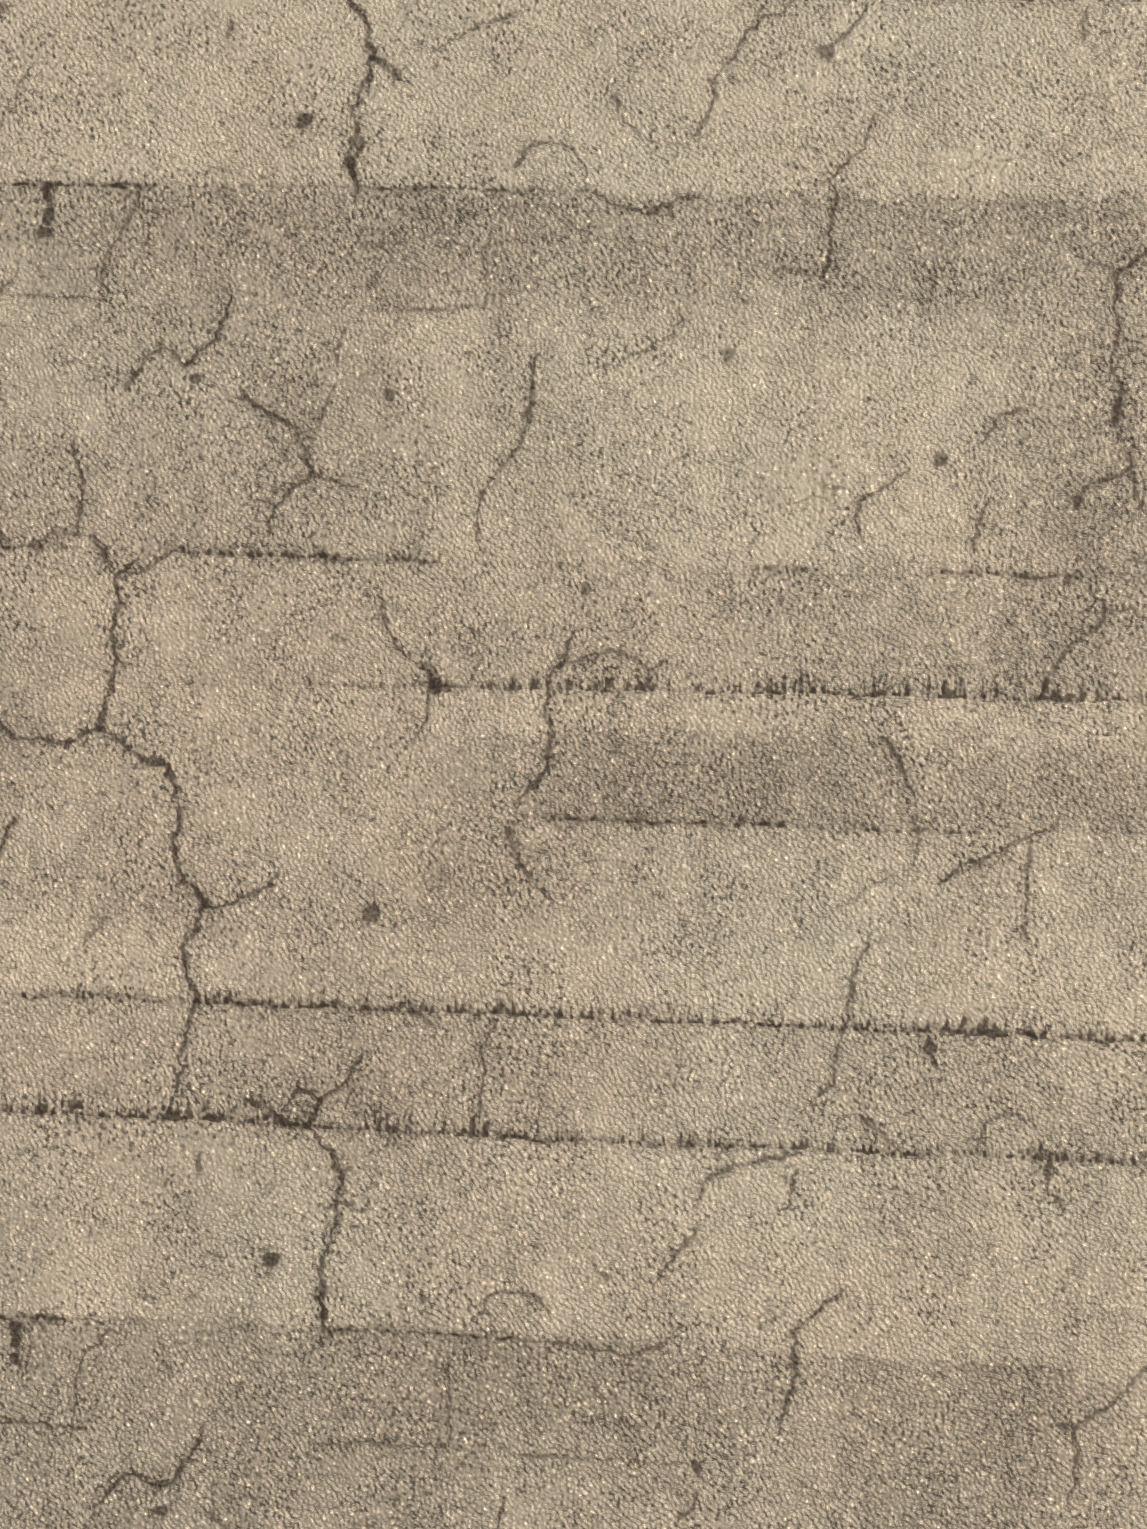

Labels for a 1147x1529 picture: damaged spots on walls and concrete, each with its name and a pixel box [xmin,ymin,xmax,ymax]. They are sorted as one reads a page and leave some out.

crack [339,0,525,206]
crack [117,287,234,395]
crack [235,326,360,540]
crack [1076,246,1147,516]
crack [1036,582,1147,703]
crack [0,438,279,1125]
crack [494,625,671,904]
crack [809,728,1059,1151]
crack [240,1051,373,1353]
crack [473,1283,687,1360]
crack [648,1150,802,1290]
crack [775,1283,847,1437]